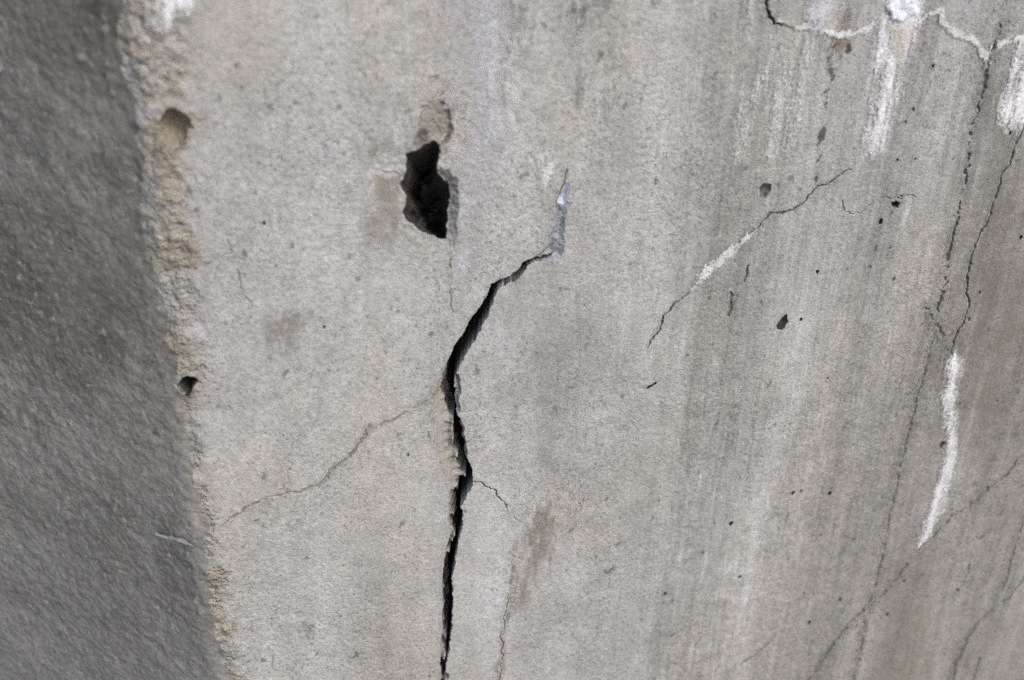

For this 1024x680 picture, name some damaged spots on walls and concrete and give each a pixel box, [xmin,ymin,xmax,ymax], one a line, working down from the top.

hole [369,91,462,314]
crack [762,0,795,33]
crack [645,167,919,351]
leakage [734,0,1024,164]
crack [920,10,1024,356]
crack [217,162,573,680]
efflorescence [918,350,963,548]
crack [806,452,1024,680]